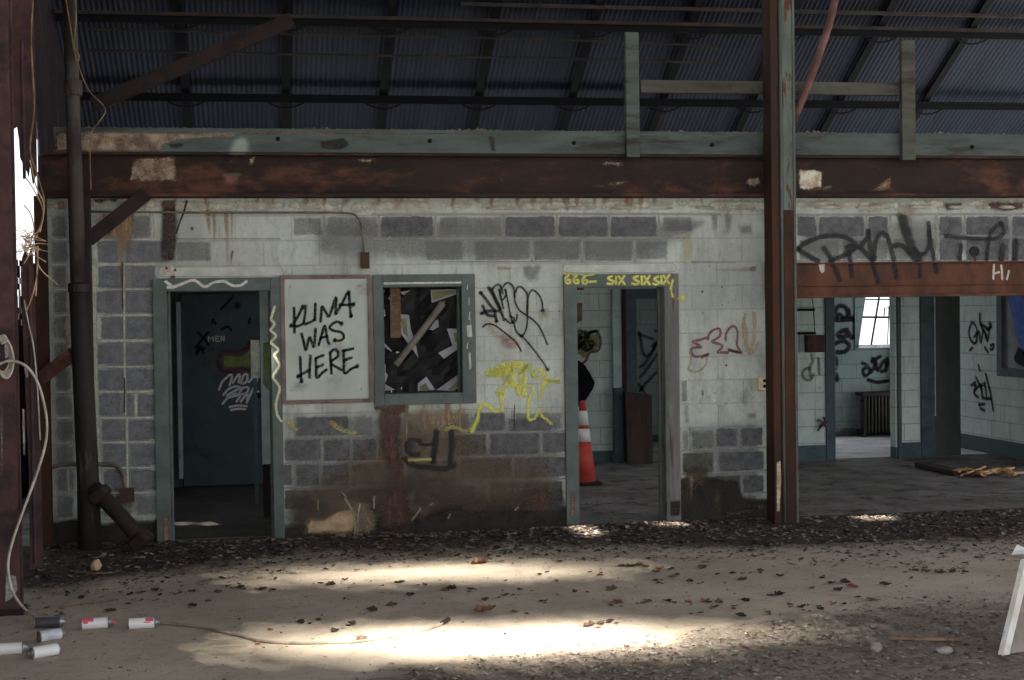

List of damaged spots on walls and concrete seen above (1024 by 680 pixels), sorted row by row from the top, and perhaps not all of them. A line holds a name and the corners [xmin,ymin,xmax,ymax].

peeling [130,157,175,181]
peeling [799,170,823,189]
corrosion [161,200,177,261]
corrosion [375,404,461,480]
damp [285,428,566,538]